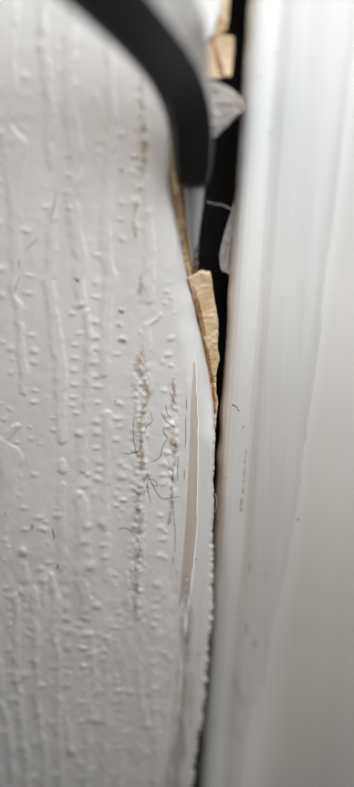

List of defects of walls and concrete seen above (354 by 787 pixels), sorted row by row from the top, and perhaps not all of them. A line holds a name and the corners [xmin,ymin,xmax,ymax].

crack [180,0,246,484]
spalling [208,0,234,79]